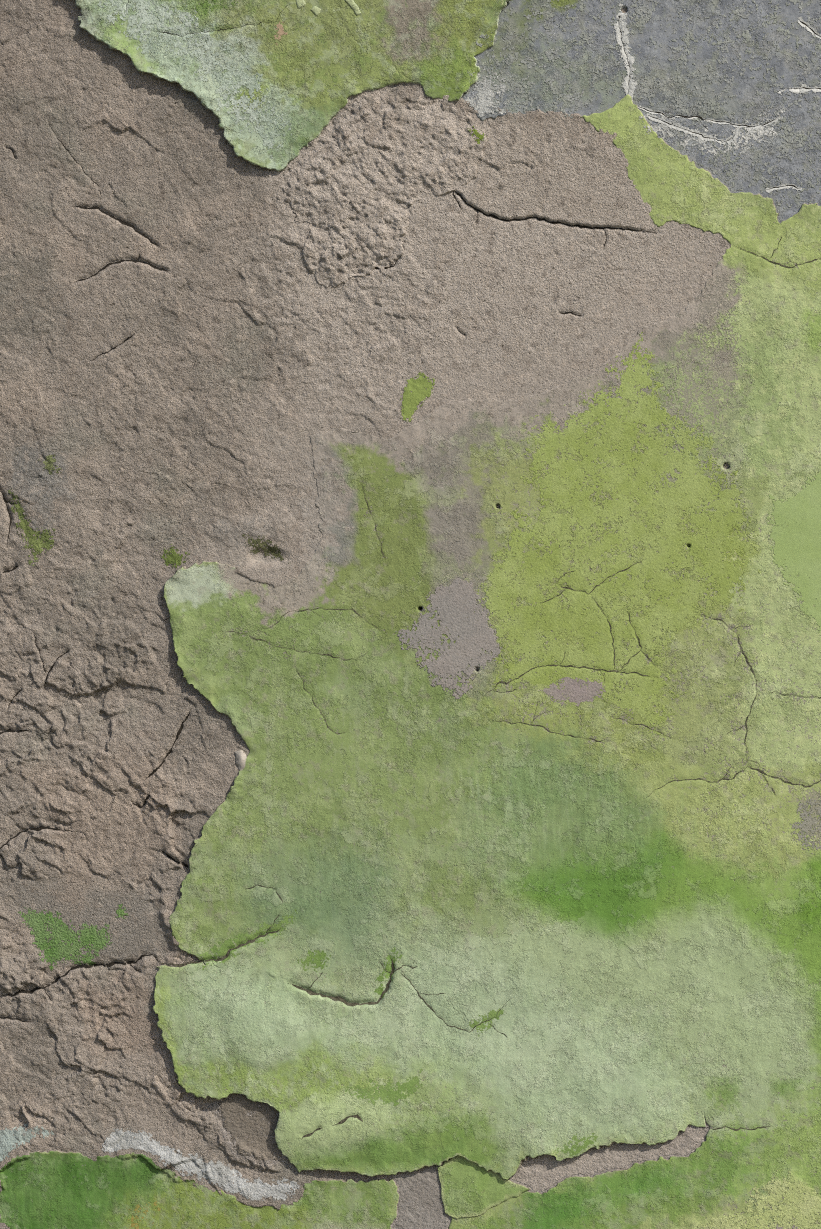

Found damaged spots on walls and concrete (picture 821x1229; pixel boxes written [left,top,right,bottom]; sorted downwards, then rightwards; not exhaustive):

crack [44,115,171,283]
peeling [75,0,821,288]
crack [453,191,658,246]
crack [613,3,821,145]
peeling [395,332,821,738]
crack [132,712,190,808]
flaking render [235,750,247,771]
crack [488,558,676,742]
crack [648,614,821,797]
crack [0,884,283,1022]
spalling [145,1075,286,1174]
peeling [697,1164,821,1229]